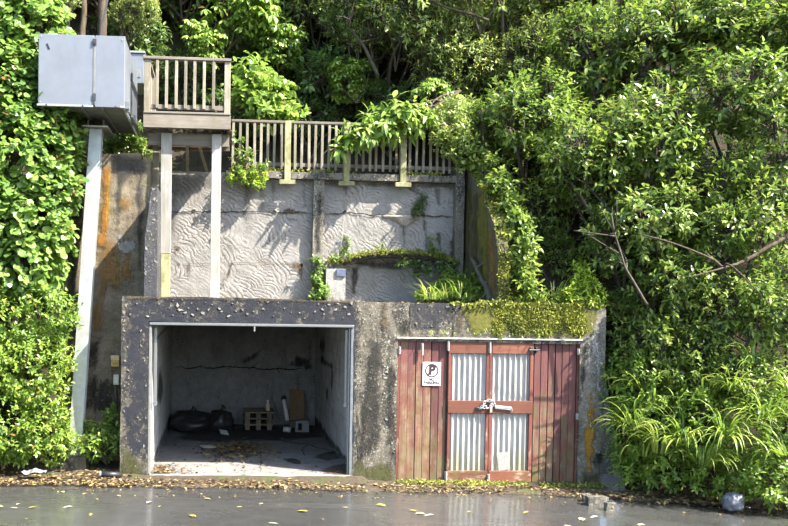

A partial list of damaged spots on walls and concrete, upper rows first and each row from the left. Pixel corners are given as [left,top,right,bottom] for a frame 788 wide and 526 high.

rust [94,167,130,329]
crack [171,209,451,229]
damp [464,189,489,282]
crack [175,364,302,374]
damp [359,340,396,460]
rust [585,394,596,472]